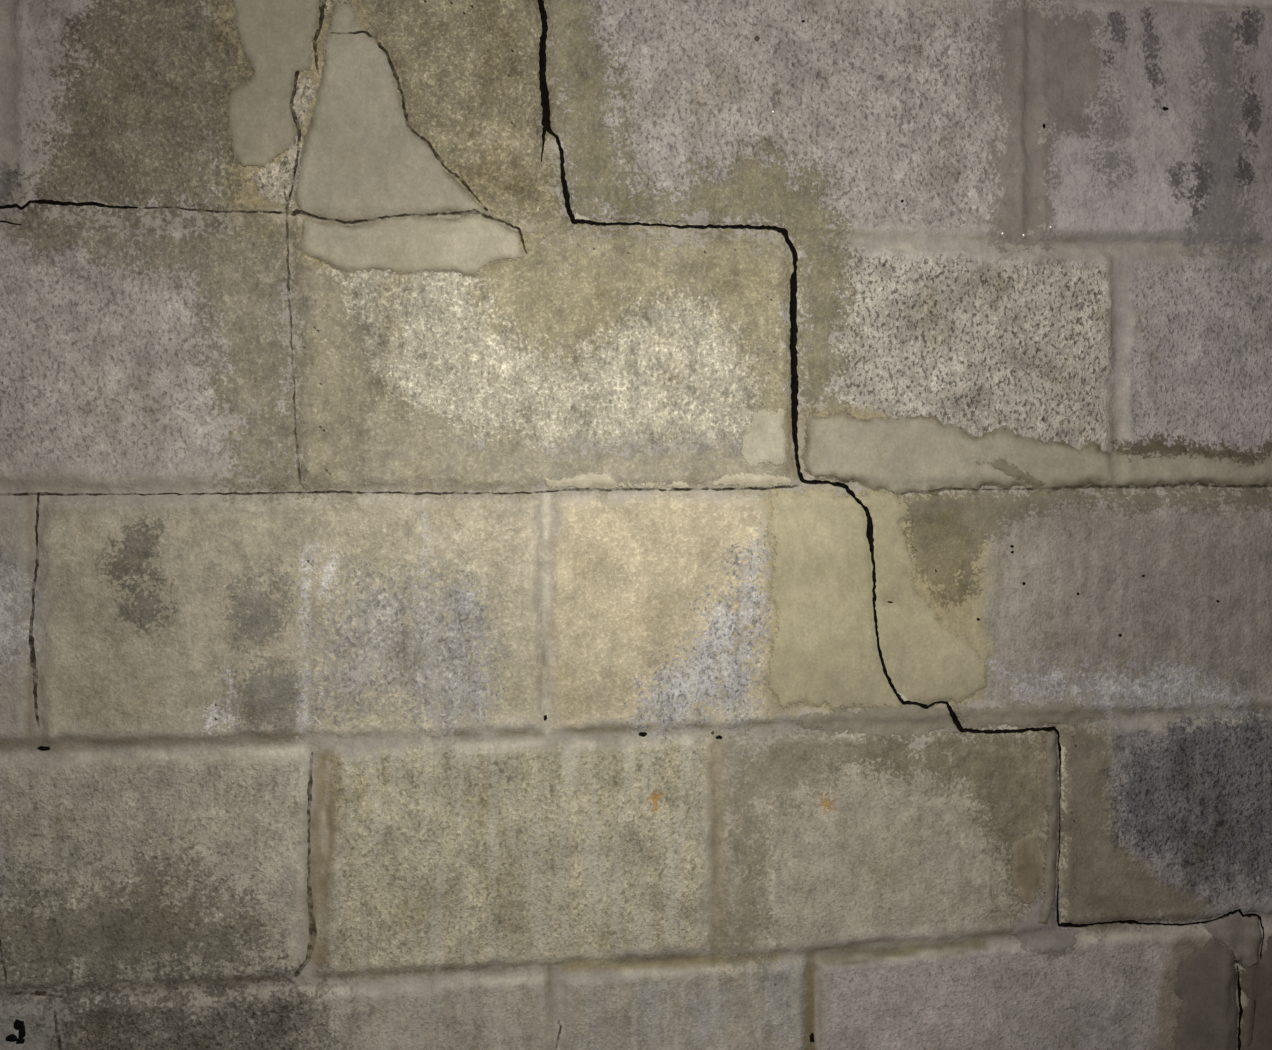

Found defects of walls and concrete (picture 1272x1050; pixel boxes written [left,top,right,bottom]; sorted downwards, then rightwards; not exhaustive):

crack [0,4,527,350]
spalling [252,75,317,212]
damp [982,0,1136,253]
damp [1142,8,1164,102]
damp [1170,10,1262,259]
crack [13,492,107,720]
crack [124,489,481,497]
damp [8,0,860,745]
crack [494,0,1272,959]
crack [294,752,317,977]
damp [621,527,1272,1050]
crack [1237,965,1256,1050]